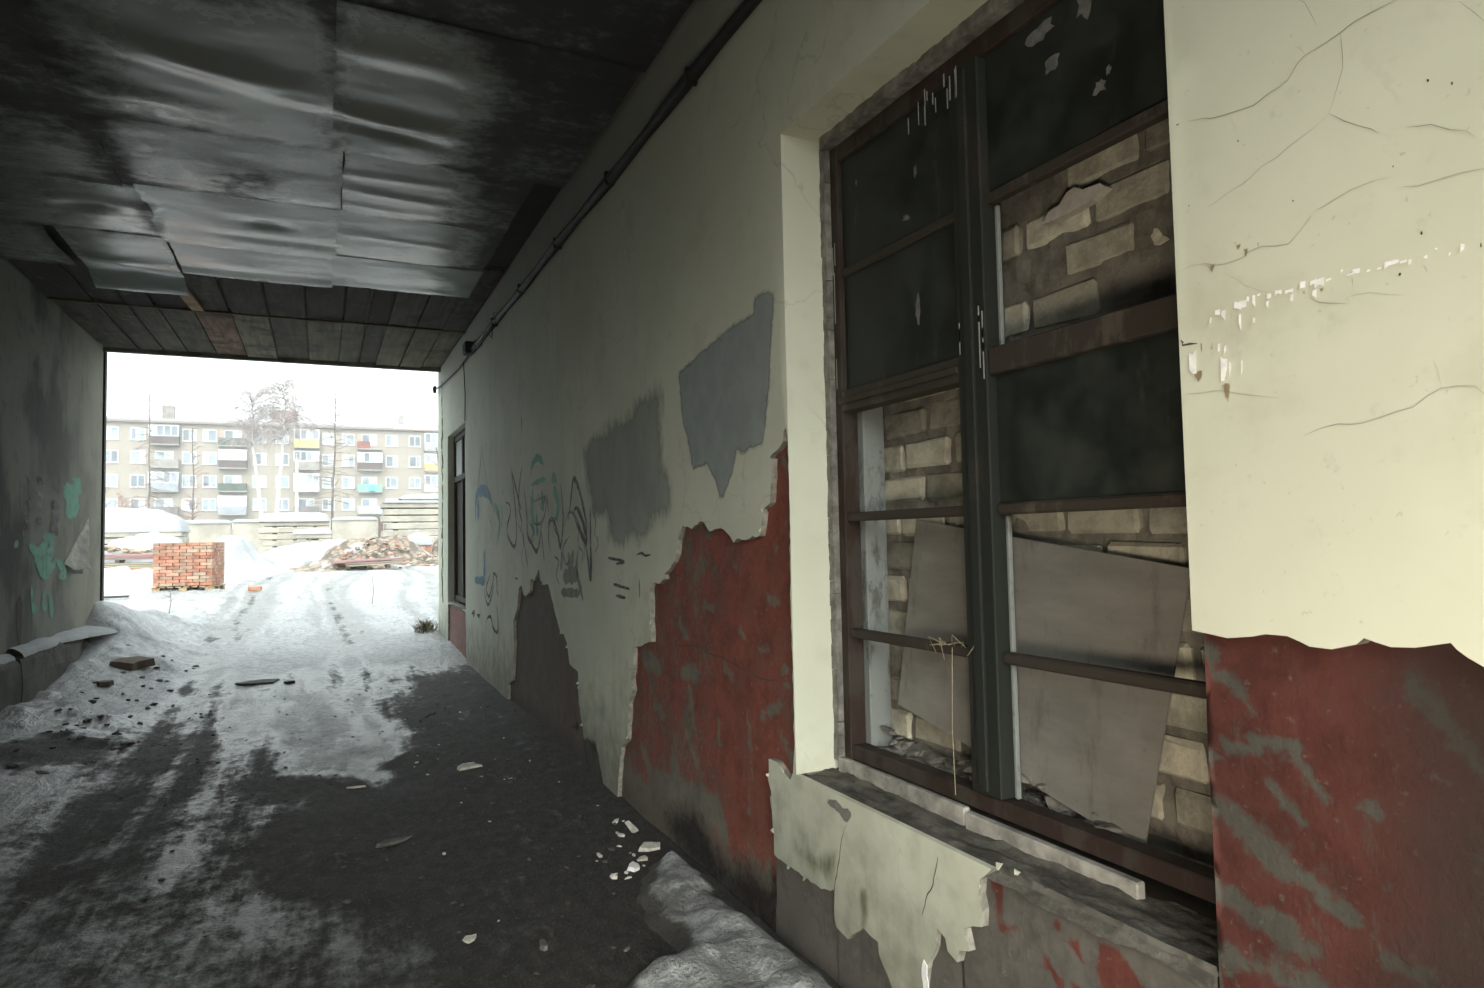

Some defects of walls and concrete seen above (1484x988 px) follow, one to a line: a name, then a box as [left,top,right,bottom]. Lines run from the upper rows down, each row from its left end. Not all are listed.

crack [1191,0,1395,204]
peeling [1189,350,1197,374]
peeling [1218,344,1243,381]
crack [1177,124,1480,293]
peeling [1209,243,1482,328]
crack [1304,363,1484,436]
flaking render [510,576,587,764]
flaking render [622,444,892,988]
flaking render [921,633,1484,988]